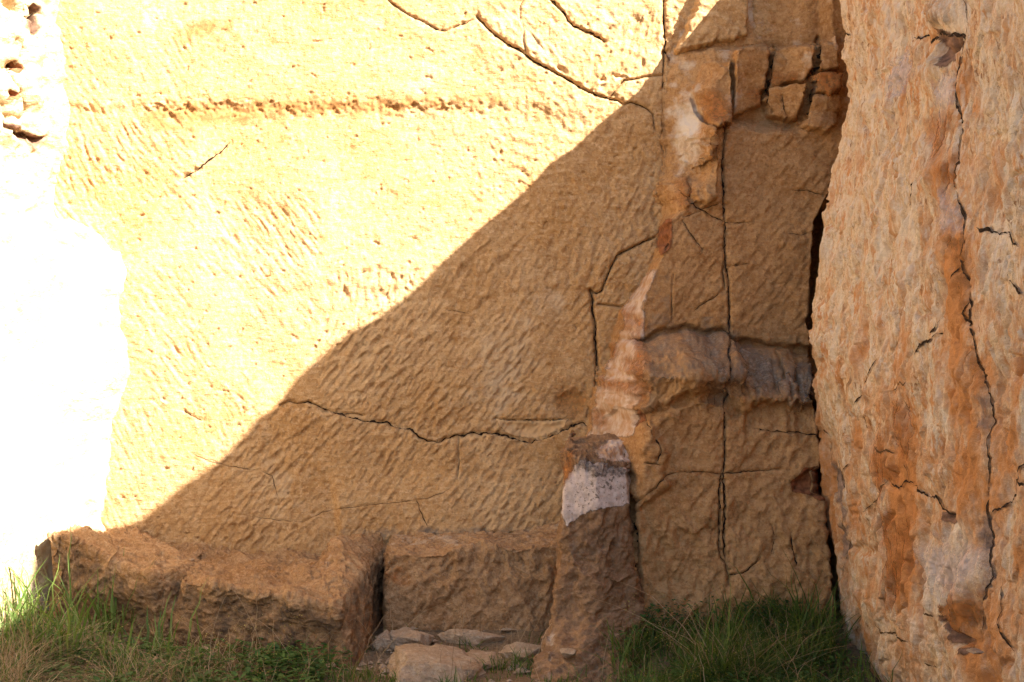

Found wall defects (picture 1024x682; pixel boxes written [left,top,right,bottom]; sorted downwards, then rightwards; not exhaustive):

crack [246,401,587,525]
spalling [595,438,631,464]
crack [590,239,652,366]
crack [633,136,797,576]
crack [842,360,956,576]
crack [914,0,1024,654]